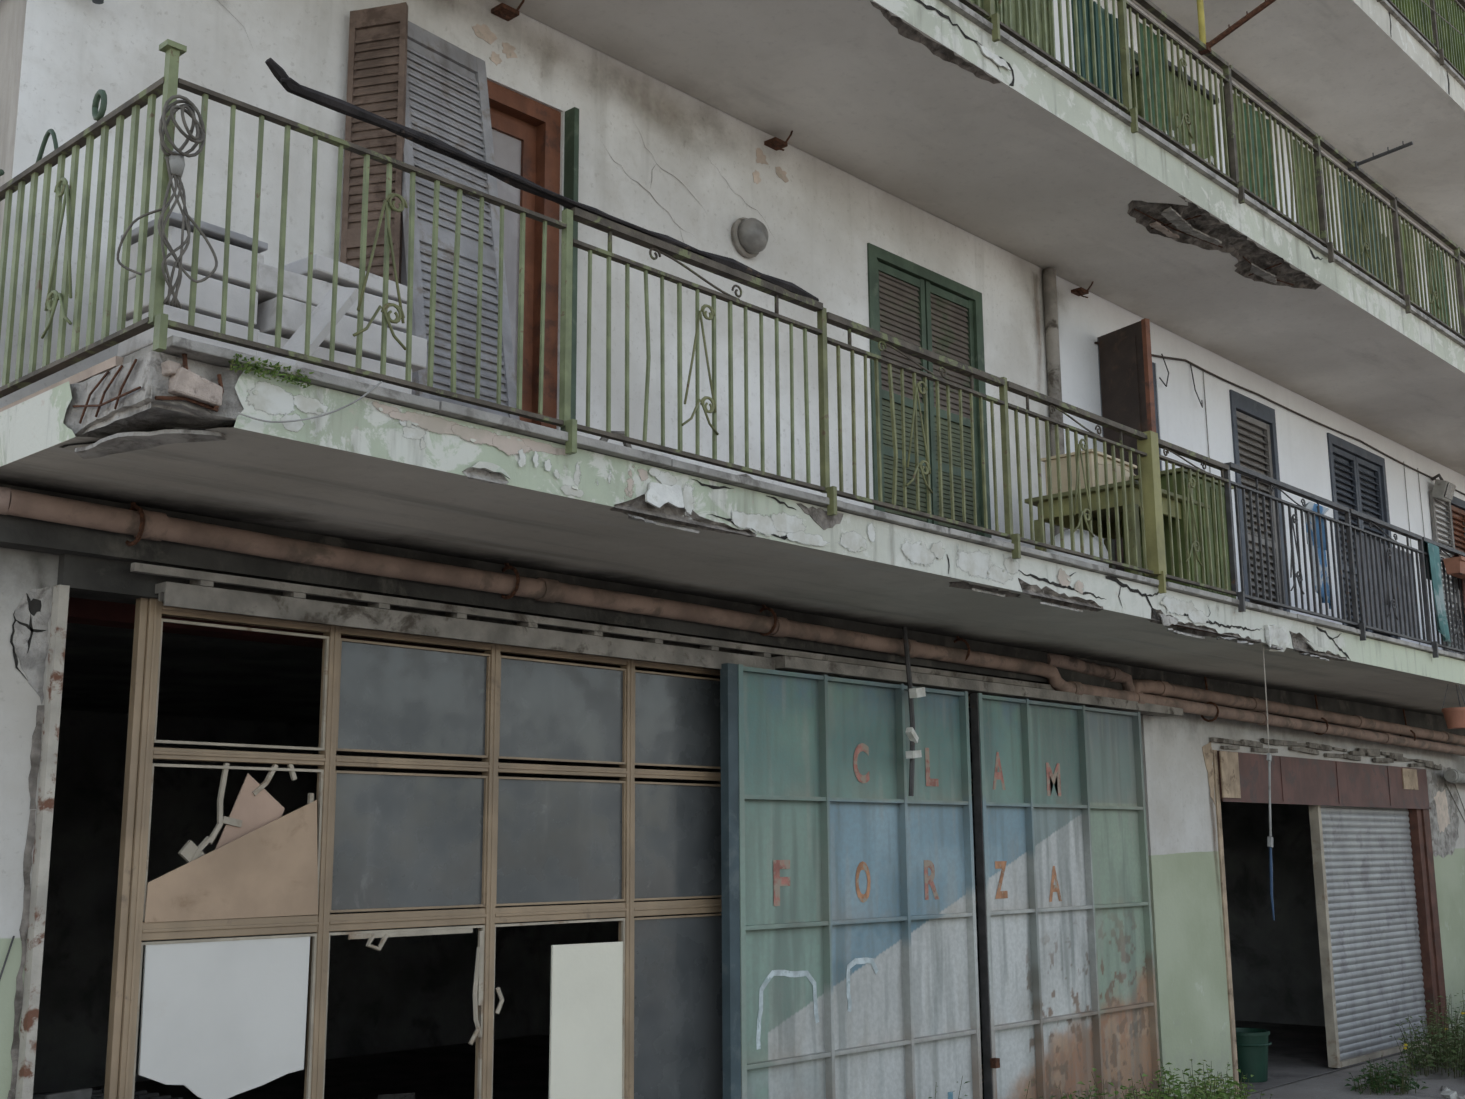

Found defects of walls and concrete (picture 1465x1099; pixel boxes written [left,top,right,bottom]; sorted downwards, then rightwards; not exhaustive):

crack [915,0,1015,86]
spalling [1128,196,1321,290]
spalling [60,350,328,459]
spalling [372,401,843,546]
crack [10,586,52,704]
spalling [949,578,1104,612]
spalling [1149,596,1347,661]
flaking render [7,705,44,1099]